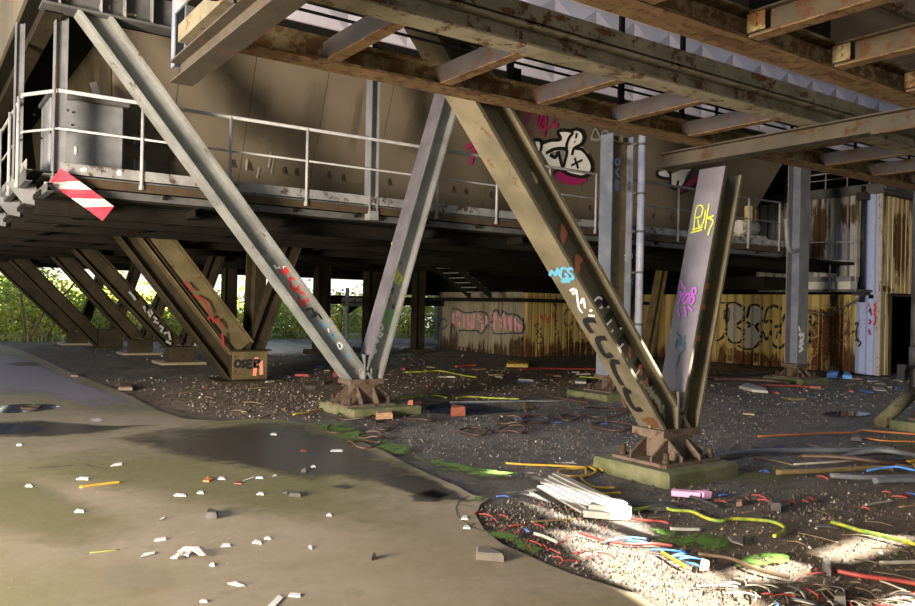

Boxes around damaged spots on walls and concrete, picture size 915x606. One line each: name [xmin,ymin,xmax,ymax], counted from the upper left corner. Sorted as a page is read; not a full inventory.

corrosion [879,211,909,292]
corrosion [807,306,855,370]